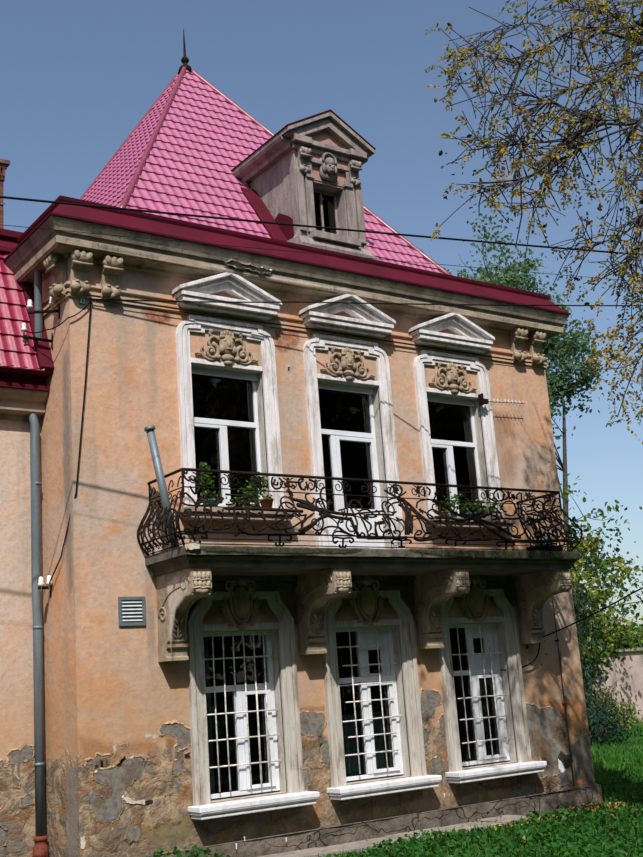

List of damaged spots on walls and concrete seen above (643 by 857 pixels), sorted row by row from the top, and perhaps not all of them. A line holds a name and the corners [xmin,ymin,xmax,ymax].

flaking render [0,744,35,808]
flaking render [80,743,147,826]
flaking render [158,719,191,778]
flaking render [303,767,312,791]
flaking render [300,710,330,769]
flaking render [419,688,445,783]
flaking render [508,702,572,799]